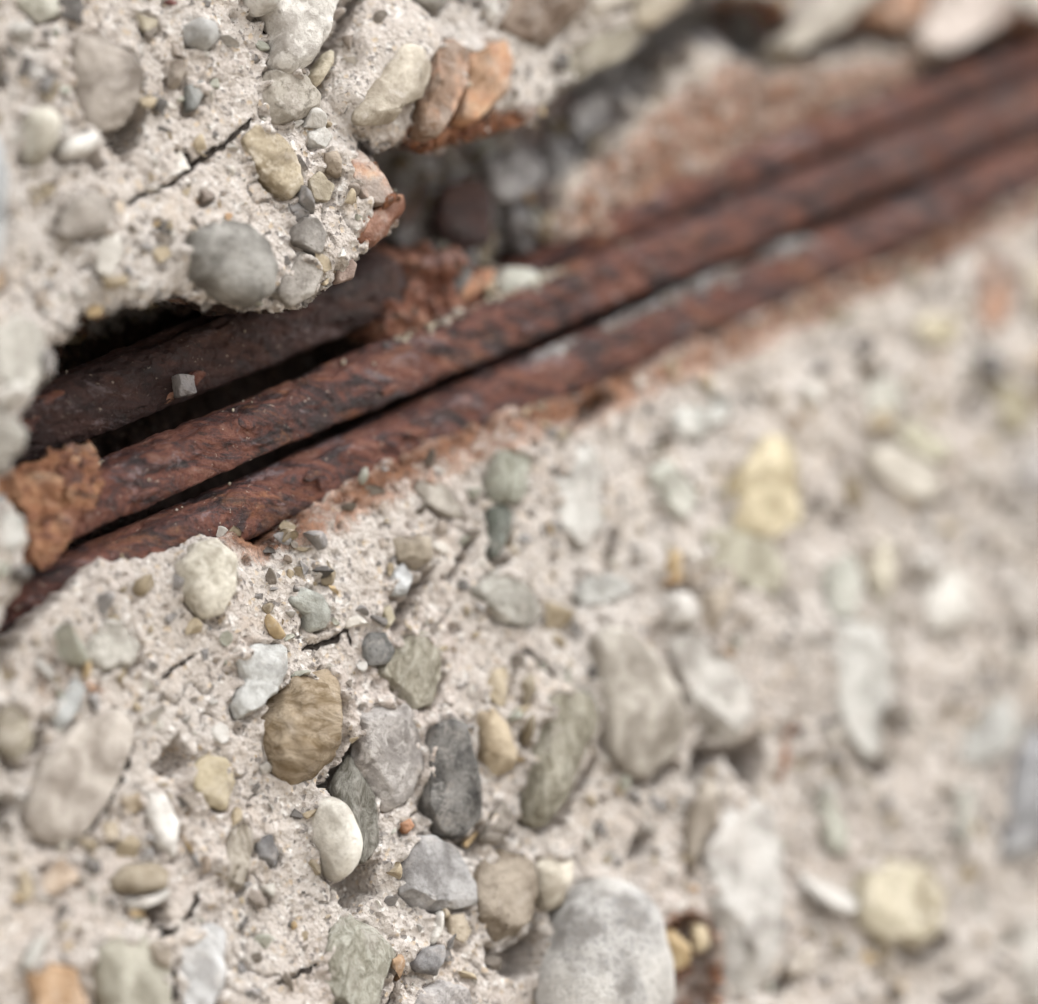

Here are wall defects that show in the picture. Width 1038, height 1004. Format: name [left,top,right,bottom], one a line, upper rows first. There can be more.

rust [707,0,795,34]
rust [987,7,1038,36]
rust [400,105,535,154]
rust [51,315,106,375]
spalling [0,0,1038,663]
rust [219,187,1038,563]
rust [0,440,104,571]